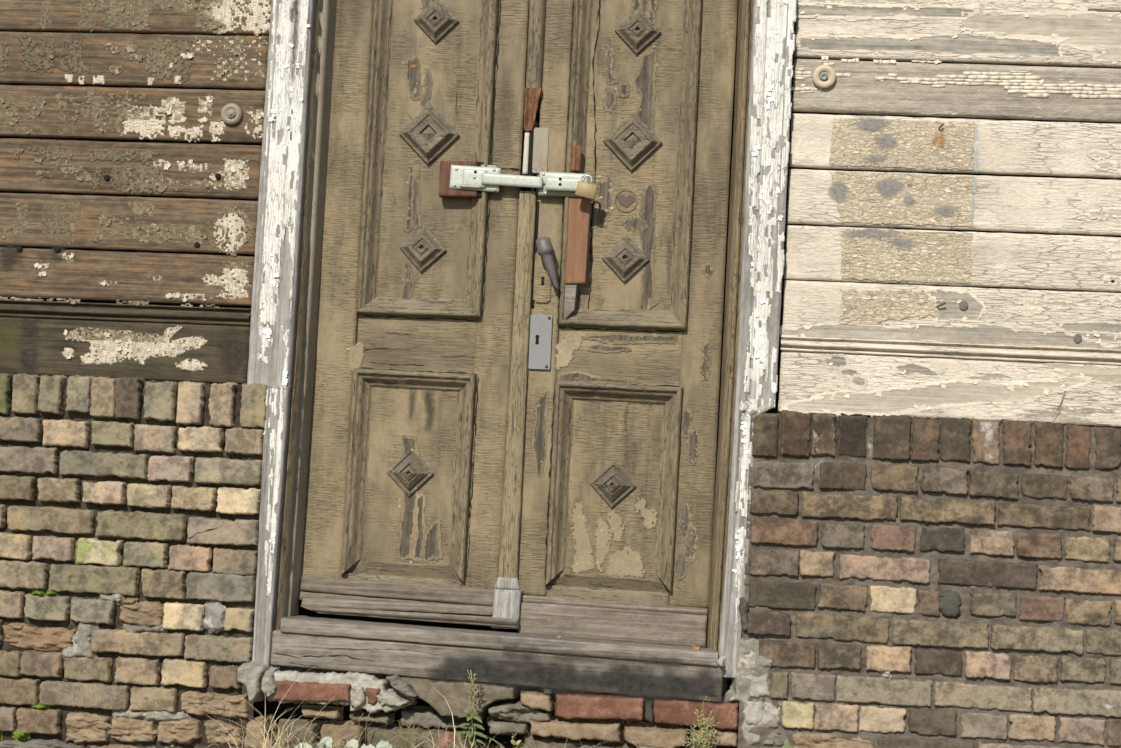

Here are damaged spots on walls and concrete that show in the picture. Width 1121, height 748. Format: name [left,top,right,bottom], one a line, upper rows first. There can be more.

peeling [0,0,310,610]
peeling [568,497,658,578]
leakage [878,180,913,204]
peeling [732,0,1121,632]